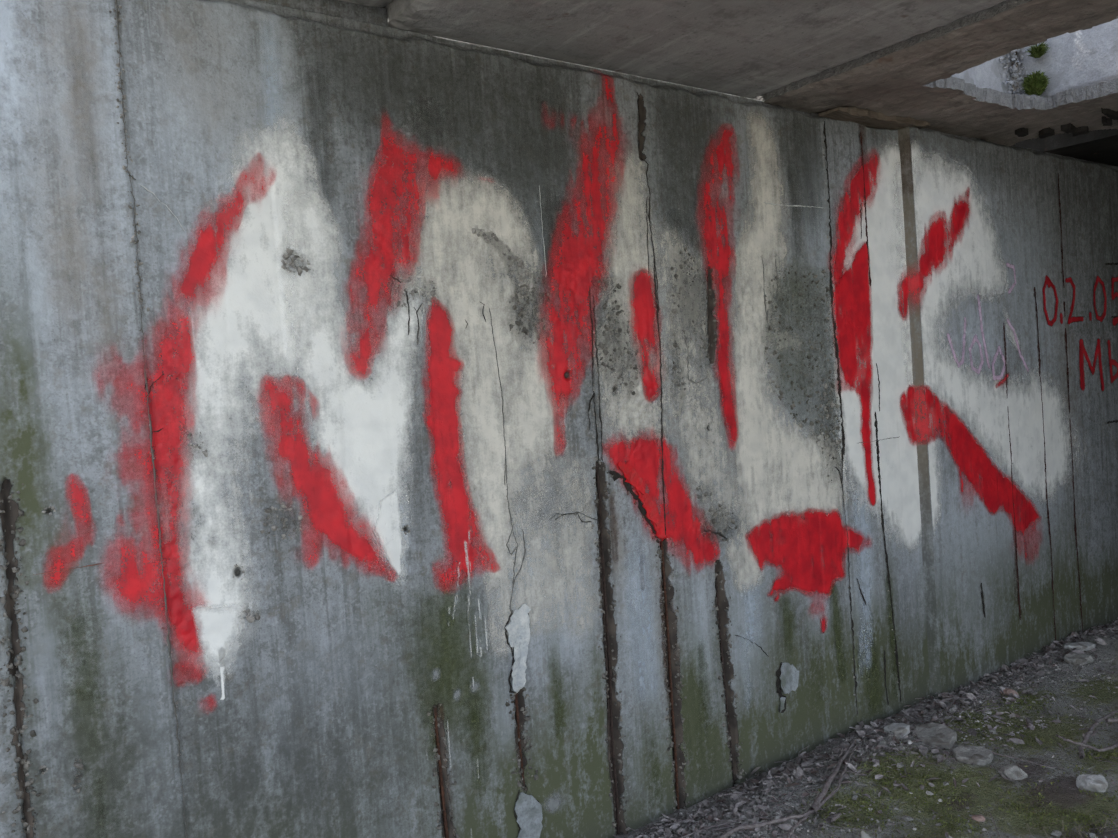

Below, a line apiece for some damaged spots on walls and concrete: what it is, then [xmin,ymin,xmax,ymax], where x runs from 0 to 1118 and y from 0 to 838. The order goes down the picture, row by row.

crack [465,302,597,615]
damp [430,593,479,755]
peeling [505,603,543,838]
peeling [776,662,799,713]
damp [830,583,846,680]